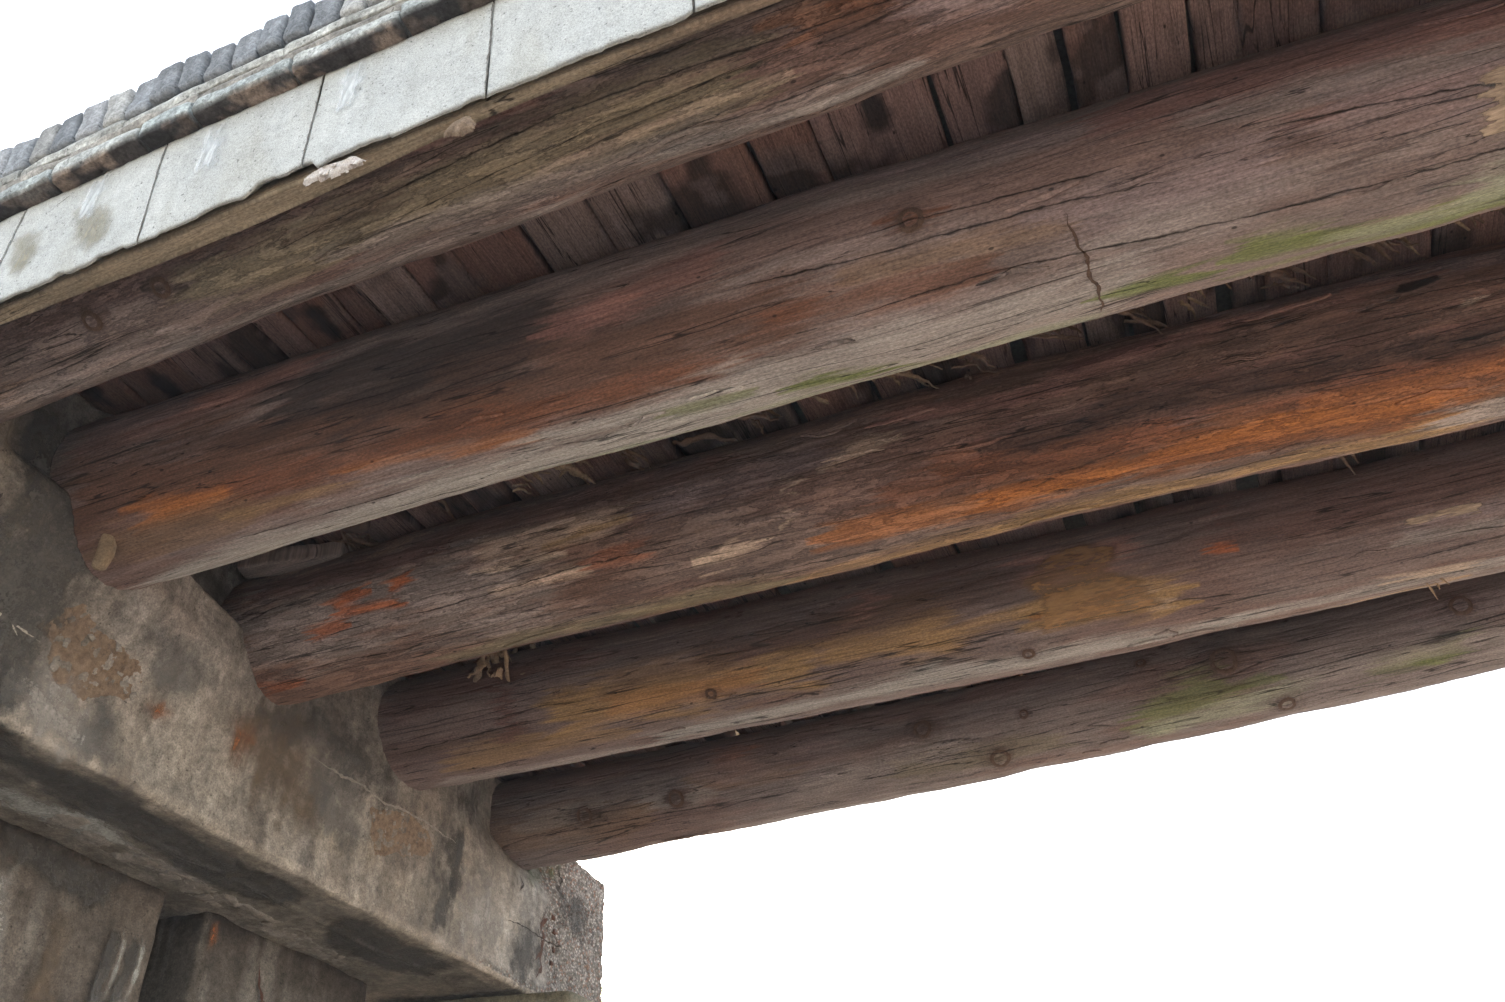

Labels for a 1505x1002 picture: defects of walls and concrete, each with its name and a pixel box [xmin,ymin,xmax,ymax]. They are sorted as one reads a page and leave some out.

crack [1067,215,1105,311]
damp [0,414,301,911]